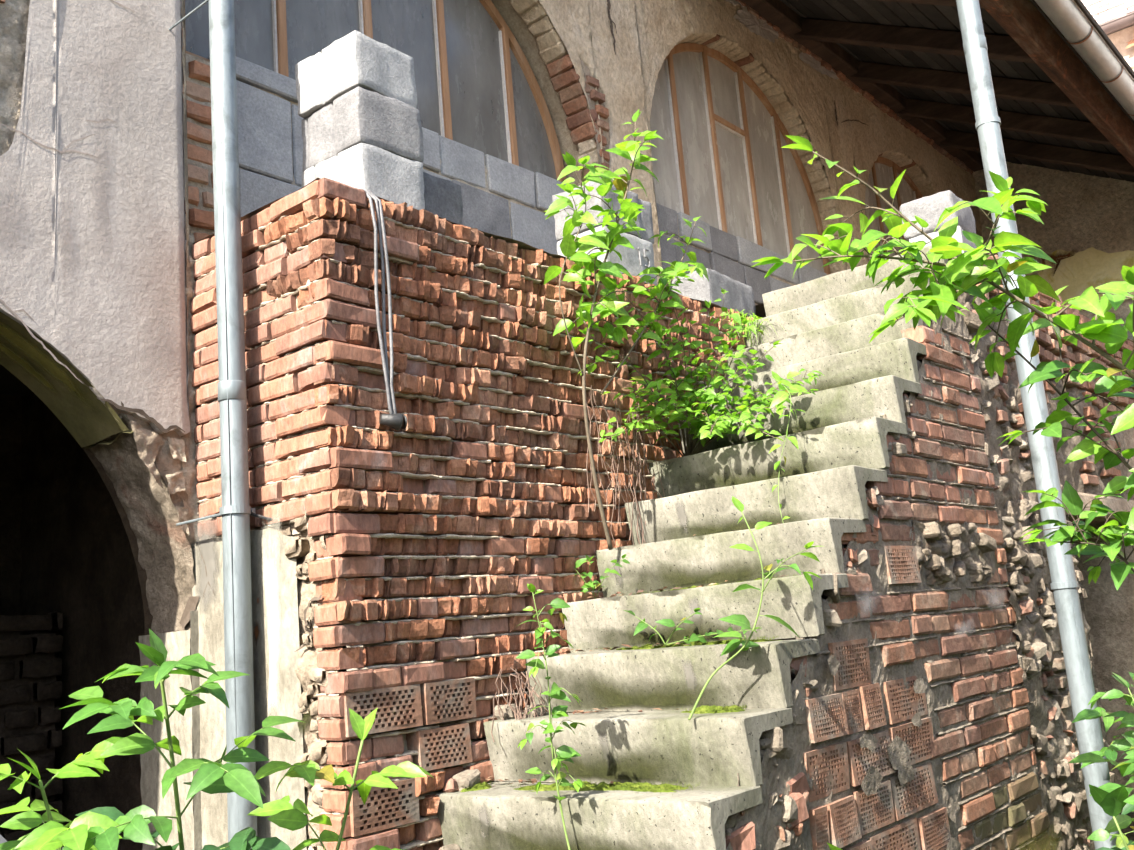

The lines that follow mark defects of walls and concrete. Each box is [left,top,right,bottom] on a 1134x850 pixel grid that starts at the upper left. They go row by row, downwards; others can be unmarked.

crack [607,0,617,55]
flaking render [0,0,30,156]
crack [0,118,118,159]
flaking render [1038,247,1134,311]
flaking render [106,407,190,553]
spalling [911,519,997,585]